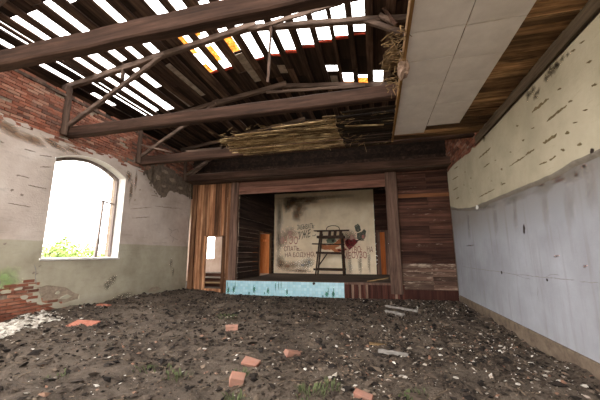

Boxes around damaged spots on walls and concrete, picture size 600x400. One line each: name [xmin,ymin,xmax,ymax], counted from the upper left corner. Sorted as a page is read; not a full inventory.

flaking render [0,69,194,199]
water stain [286,199,313,218]
flaking render [0,265,79,322]